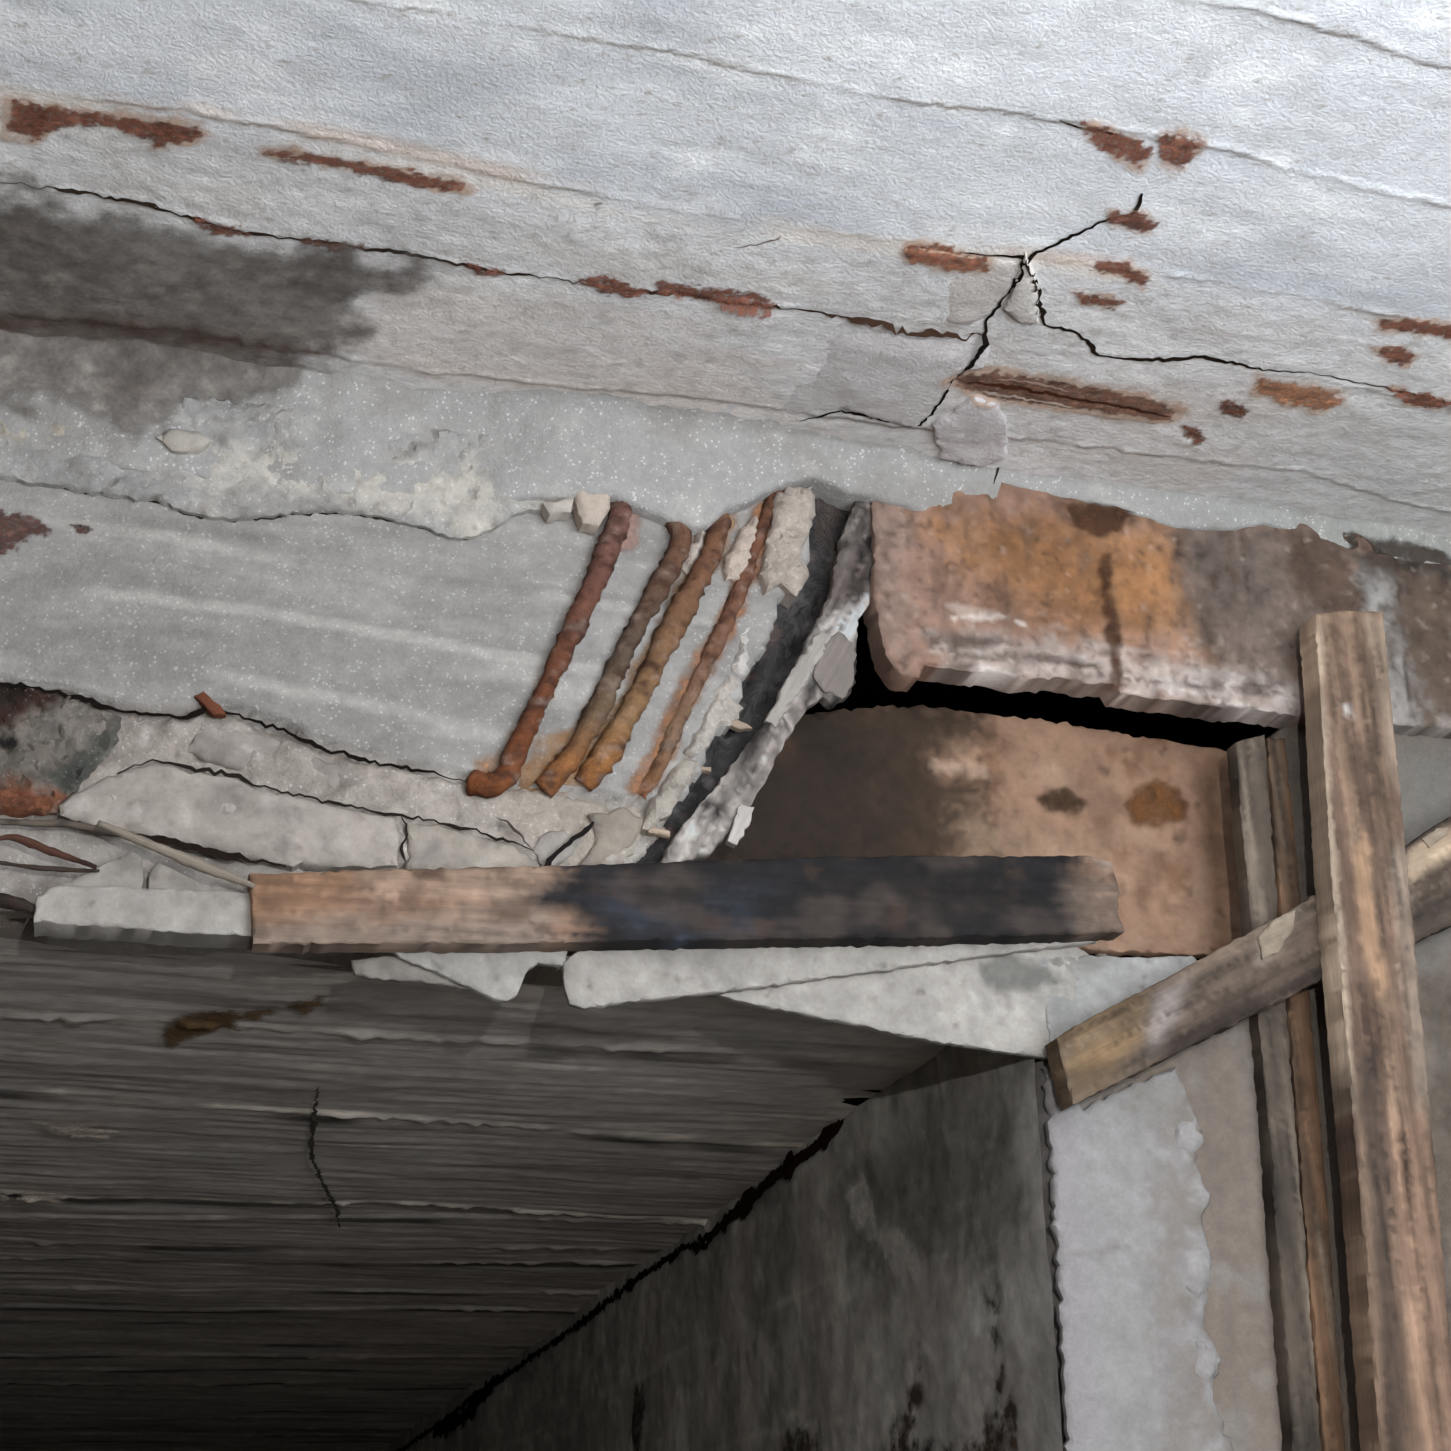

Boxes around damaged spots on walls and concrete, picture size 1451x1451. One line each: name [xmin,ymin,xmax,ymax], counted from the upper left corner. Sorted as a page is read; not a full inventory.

rust [1,99,207,147]
leakage [0,176,427,434]
crack [0,182,588,285]
rust [579,275,776,318]
crack [644,193,1445,427]
flaking render [0,396,610,542]
rust [945,367,1206,446]
spalling [722,486,816,609]
spalling [0,621,754,872]
rust [466,490,784,799]
spalling [804,614,1278,751]
crack [398,1118,845,1451]